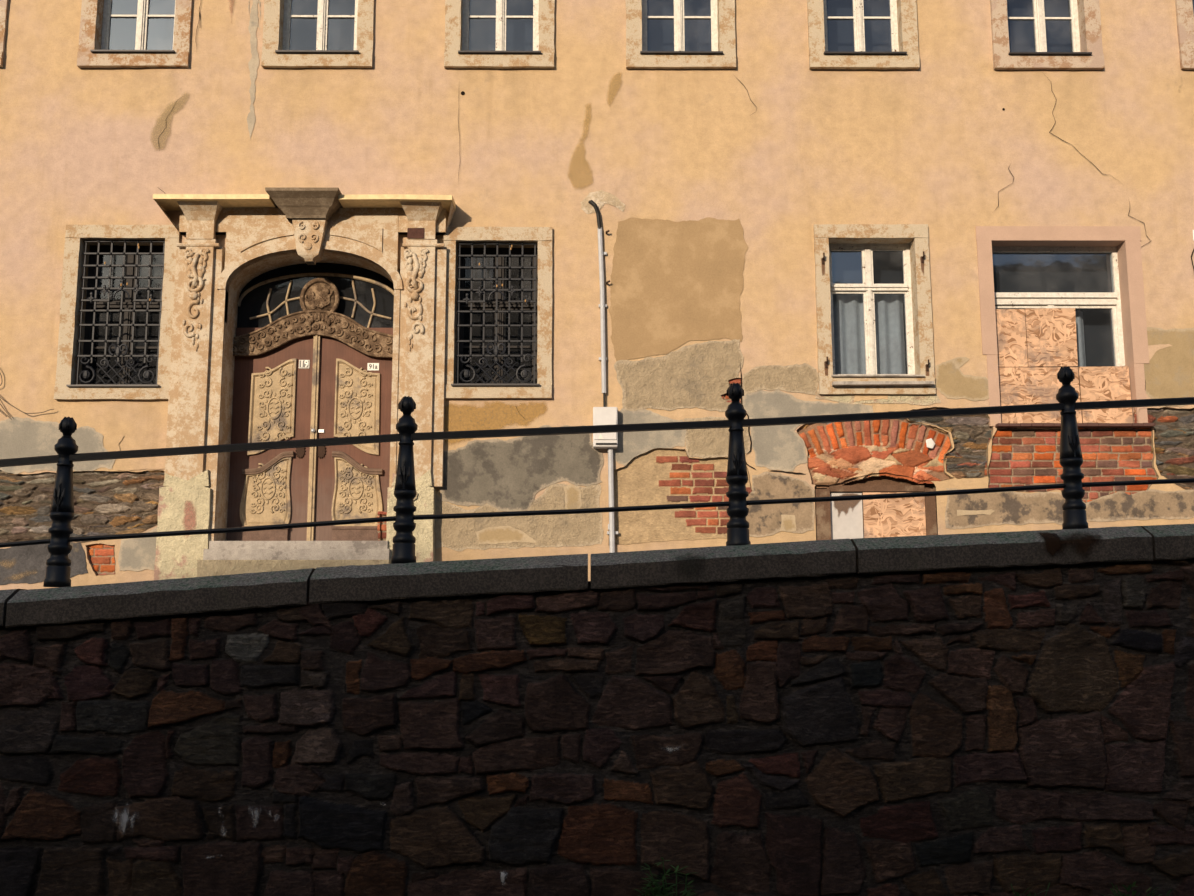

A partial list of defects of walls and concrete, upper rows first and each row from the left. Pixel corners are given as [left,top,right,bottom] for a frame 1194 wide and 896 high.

flaking render [247,0,261,140]
crack [1049,85,1151,246]
flaking render [0,417,165,576]
flaking render [434,339,1063,552]
flaking render [1078,327,1194,502]